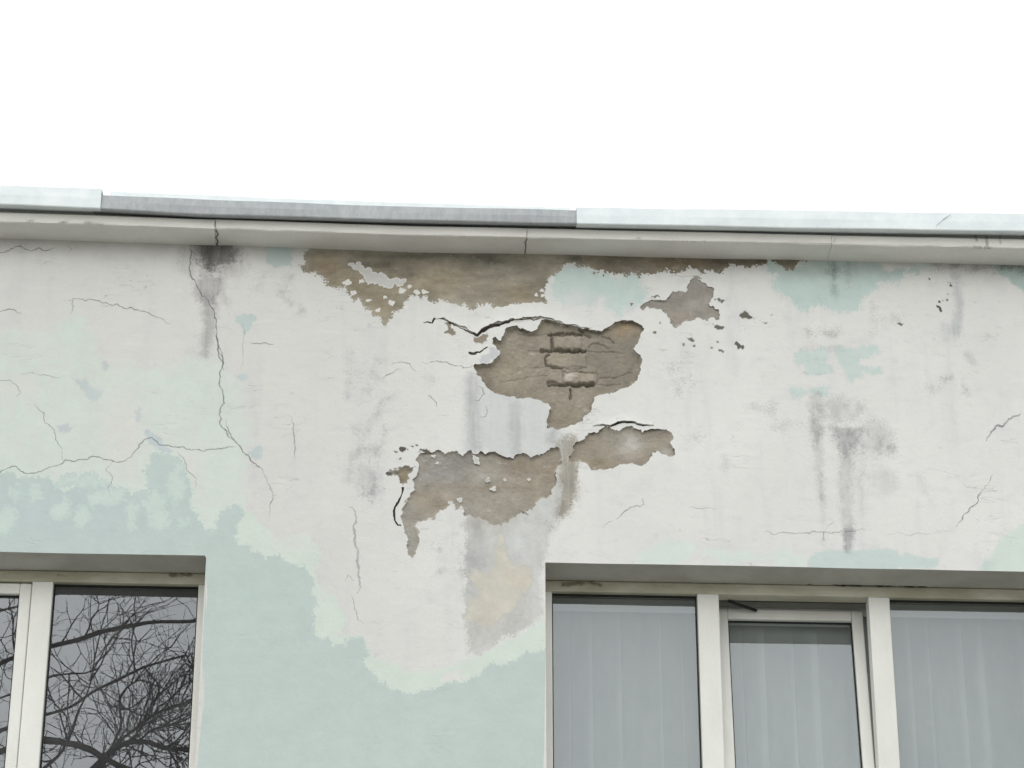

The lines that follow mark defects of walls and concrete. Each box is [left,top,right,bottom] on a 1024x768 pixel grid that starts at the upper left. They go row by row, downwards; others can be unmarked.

crack [423,318,540,355]
peeling [298,249,953,430]
peeling [0,300,546,768]
spalling [386,426,675,558]